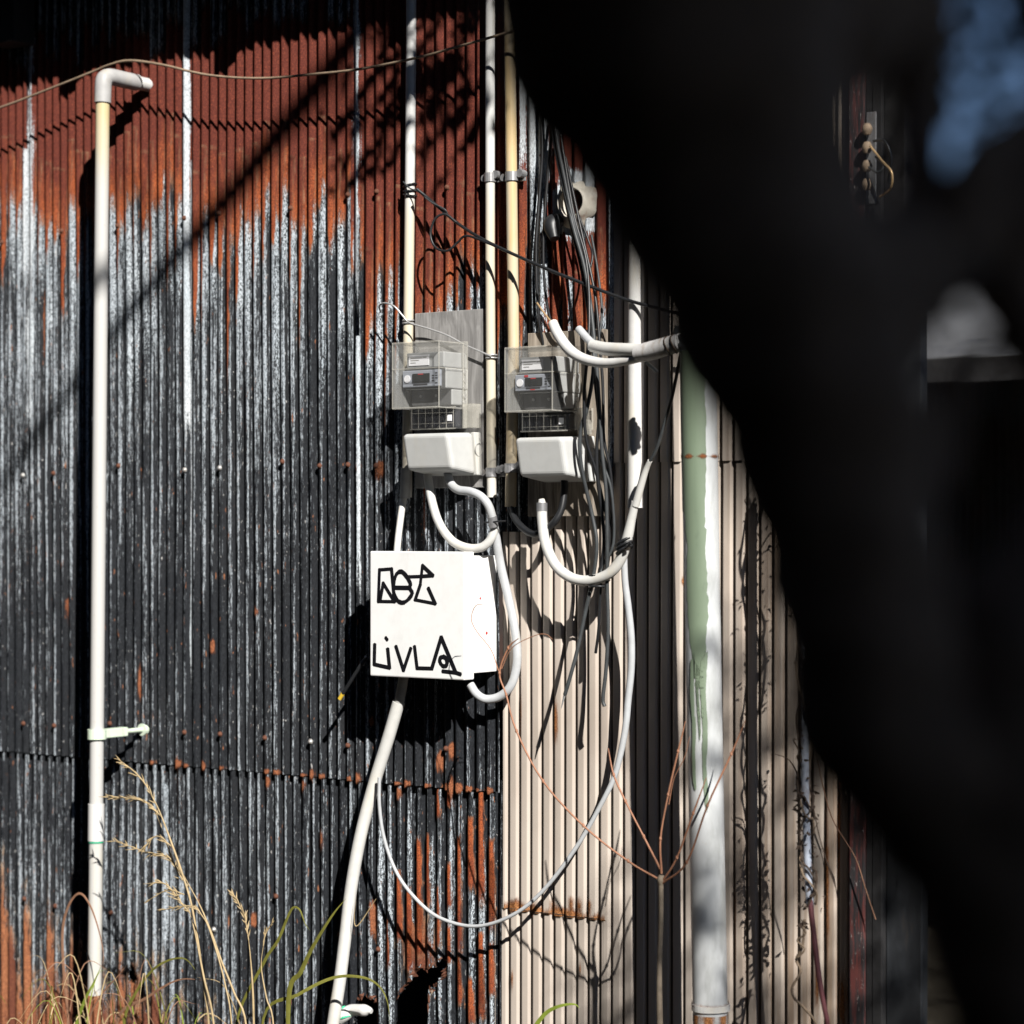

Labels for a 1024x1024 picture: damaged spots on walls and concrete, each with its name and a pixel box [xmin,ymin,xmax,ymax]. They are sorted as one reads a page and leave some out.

peeling [0,45,83,419]
peeling [110,0,414,691]
rust [0,0,608,435]
peeling [429,283,453,312]
peeling [470,246,485,310]
rust [0,854,185,1024]
rust [175,759,205,798]
rust [368,742,605,1024]